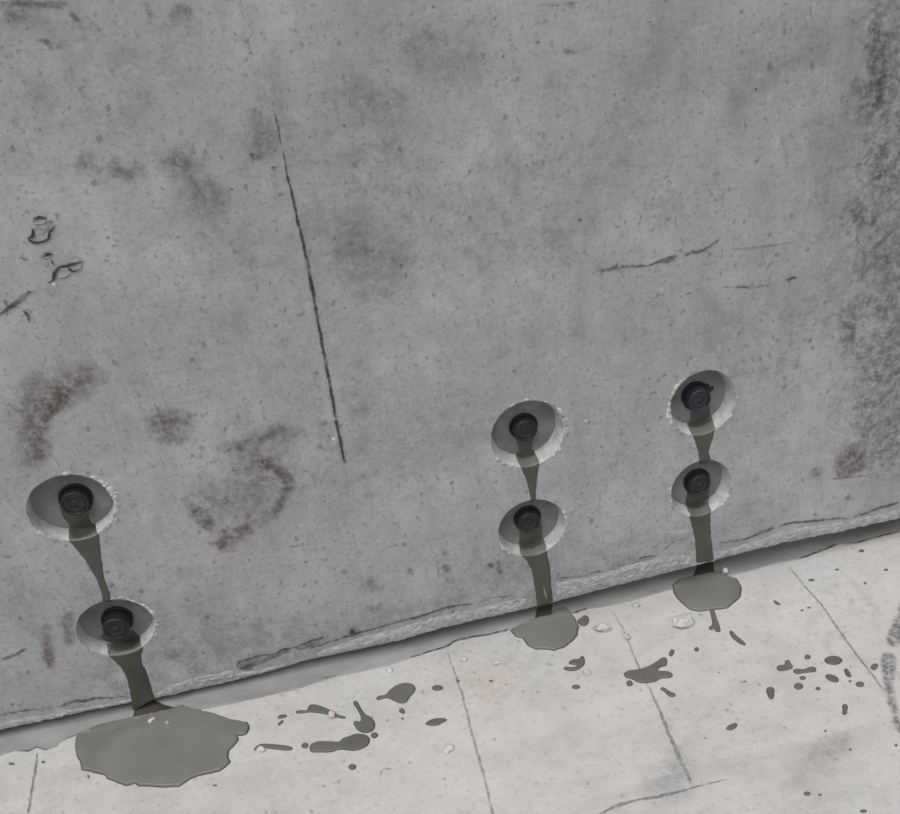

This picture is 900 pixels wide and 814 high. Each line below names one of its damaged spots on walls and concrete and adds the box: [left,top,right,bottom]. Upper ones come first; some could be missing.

peeling [28,216,84,283]
crack [275,118,345,461]
crack [603,241,718,271]
damp [687,405,715,464]
damp [516,438,540,501]
damp [60,506,112,602]
damp [685,489,714,576]